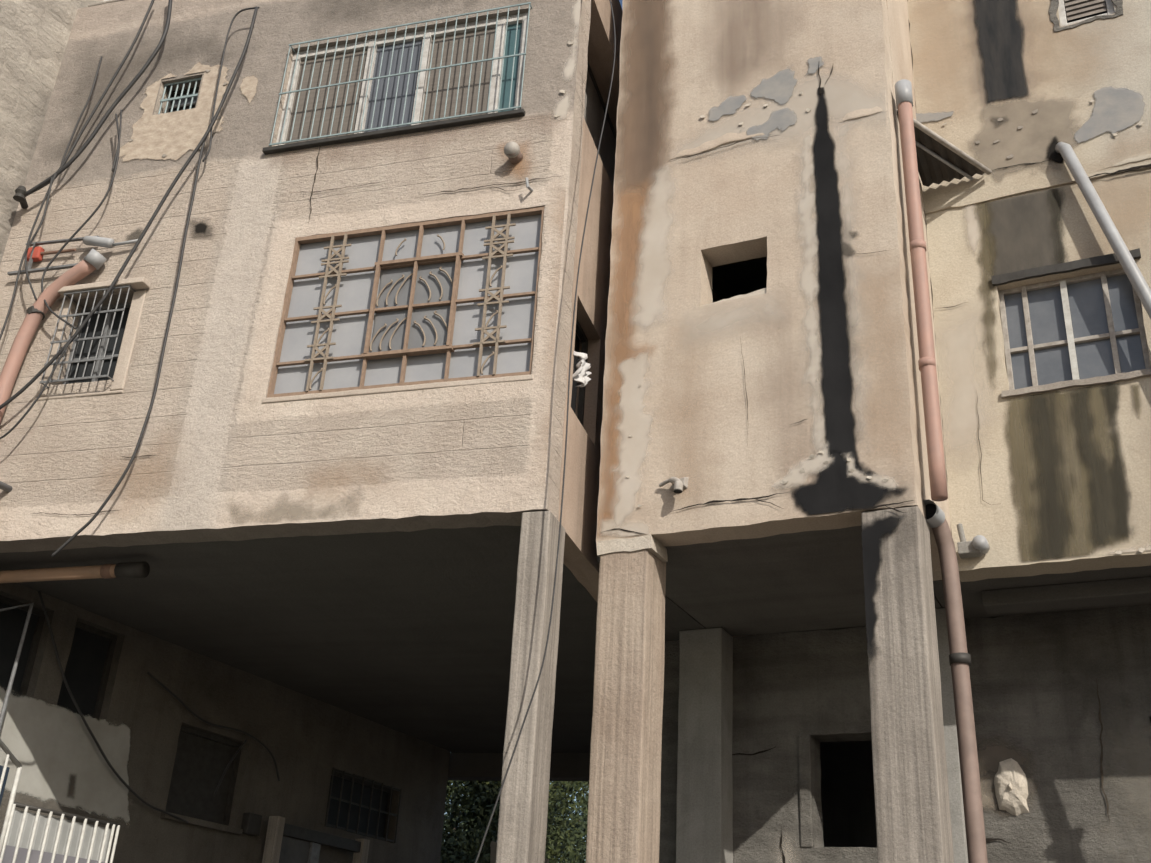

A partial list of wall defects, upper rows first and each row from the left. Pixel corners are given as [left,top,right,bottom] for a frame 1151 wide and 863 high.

flaking render [119,62,258,161]
crack [292,148,389,224]
crack [422,176,556,195]
leakage [616,0,672,326]
peeling [700,57,824,141]
leakage [974,0,1028,103]
leakage [966,188,1064,373]
leakage [792,65,905,659]
crack [670,492,788,512]
leakage [1030,395,1071,559]
leakage [1072,383,1129,545]